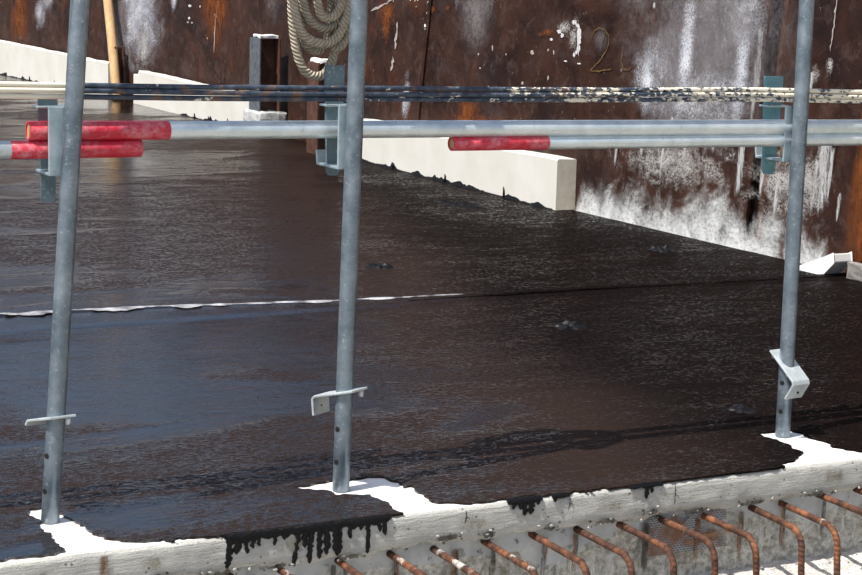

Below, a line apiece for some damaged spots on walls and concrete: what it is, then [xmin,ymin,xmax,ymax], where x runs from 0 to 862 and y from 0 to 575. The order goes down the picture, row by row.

water stain [753,27,763,87]
water stain [736,147,745,191]
water stain [803,146,841,220]
corrosion [451,549,459,575]
corrosion [685,511,744,562]